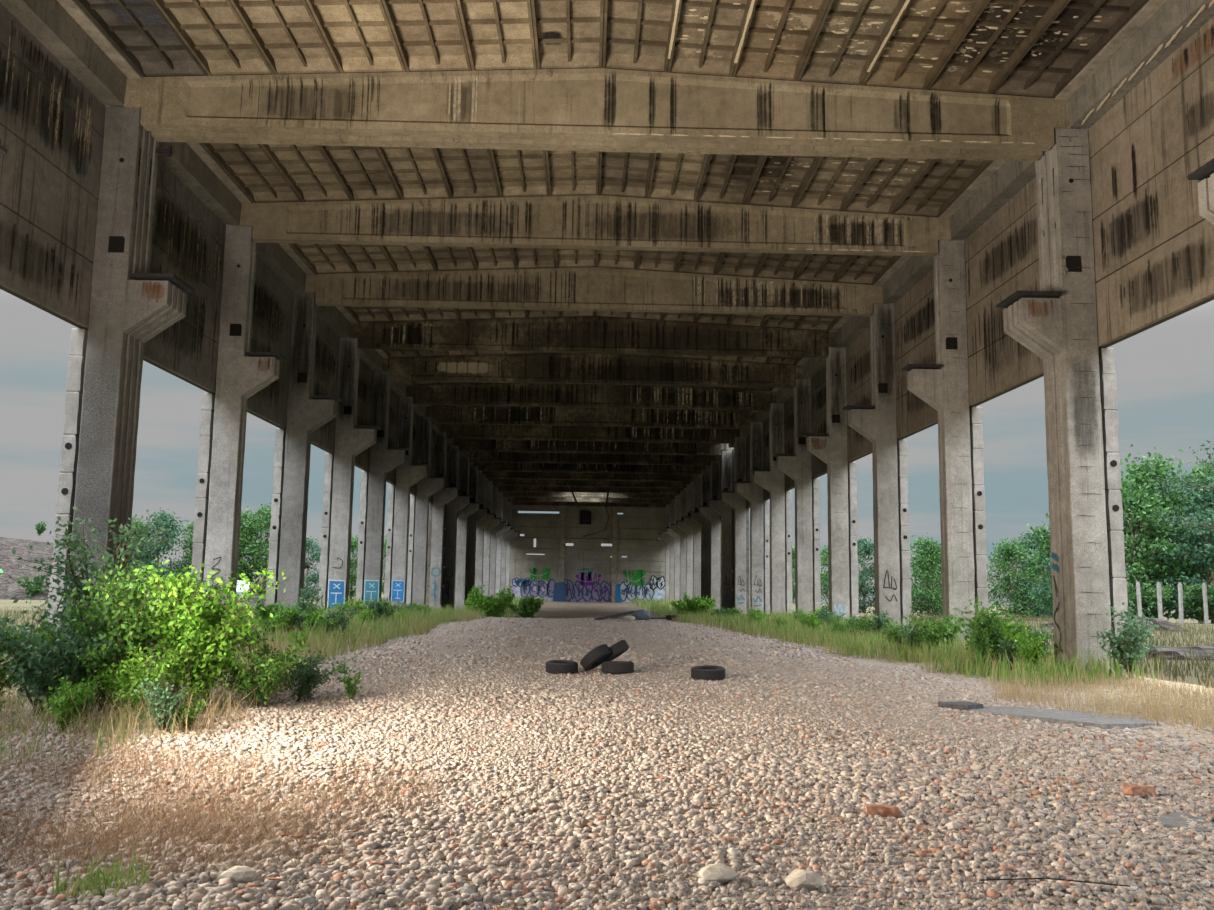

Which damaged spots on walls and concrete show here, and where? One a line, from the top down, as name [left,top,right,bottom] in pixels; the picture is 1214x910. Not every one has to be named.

peeling [676,1,741,58]
peeling [749,0,1112,73]
peeling [1082,0,1214,125]
water stain [0,21,91,176]
water stain [448,77,478,123]
water stain [757,84,774,131]
water stain [349,205,424,235]
water stain [443,202,532,239]
water stain [562,200,659,245]
water stain [814,215,909,247]
water stain [1101,148,1158,261]
water stain [425,321,752,473]